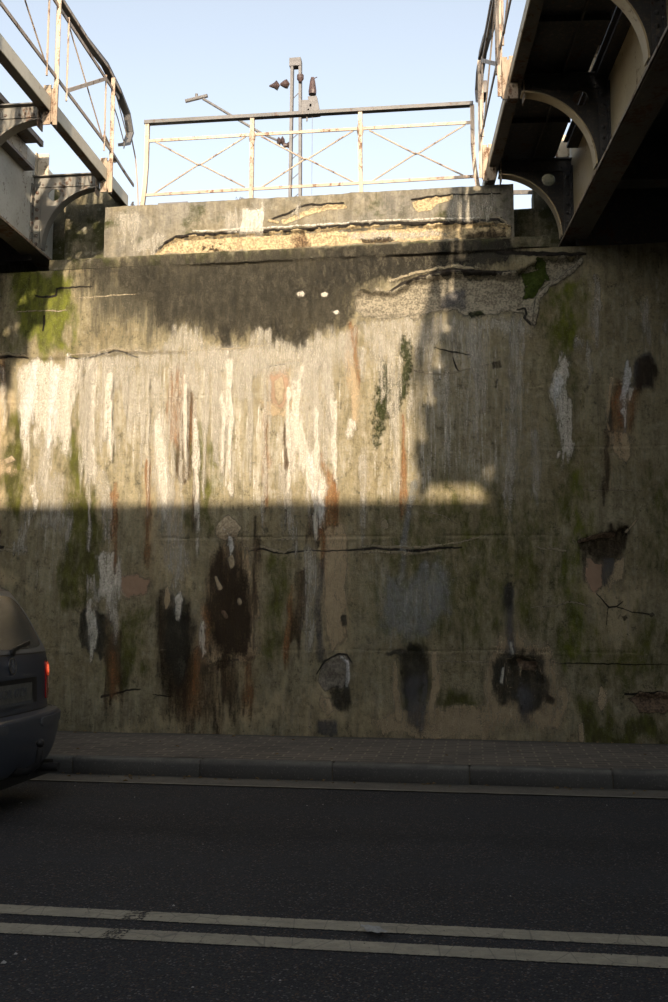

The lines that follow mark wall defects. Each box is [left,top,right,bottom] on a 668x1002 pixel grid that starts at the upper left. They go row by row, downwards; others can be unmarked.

crack [0,351,29,359]
crack [17,286,133,331]
crack [68,344,303,368]
spalling [155,192,586,364]
damp [550,356,575,460]
damp [606,296,668,441]
damp [4,210,518,732]
crack [248,504,488,555]
spalling [578,519,637,592]
peeling [316,524,352,737]
damp [492,582,551,720]
peeling [373,701,493,740]